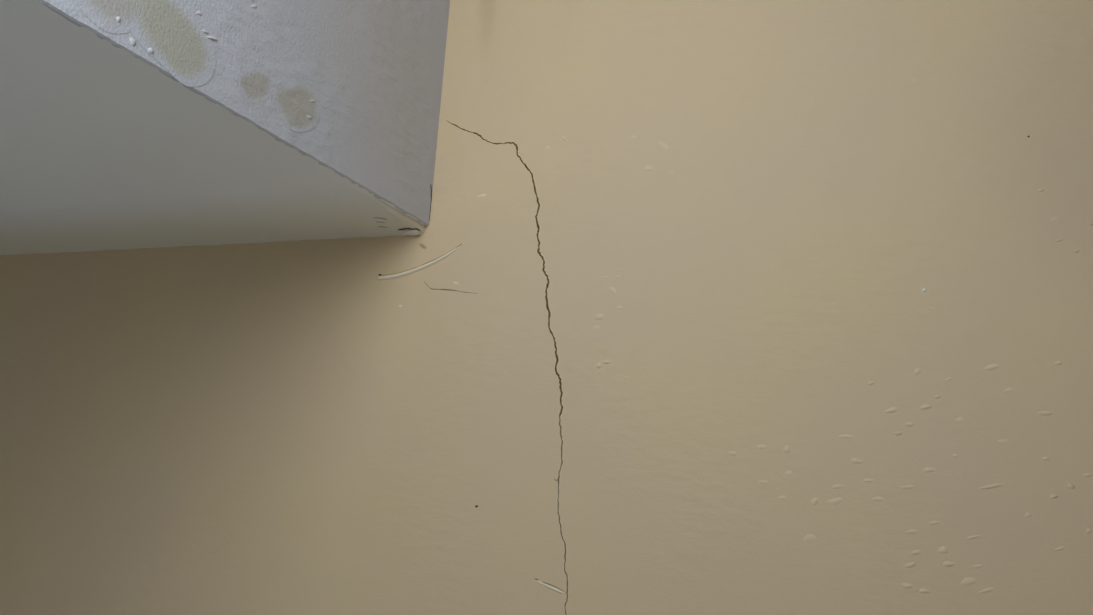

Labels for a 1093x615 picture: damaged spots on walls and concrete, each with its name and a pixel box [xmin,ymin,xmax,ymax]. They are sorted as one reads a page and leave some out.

water stain [75,0,216,87]
water stain [237,69,320,132]
crack [446,120,569,615]